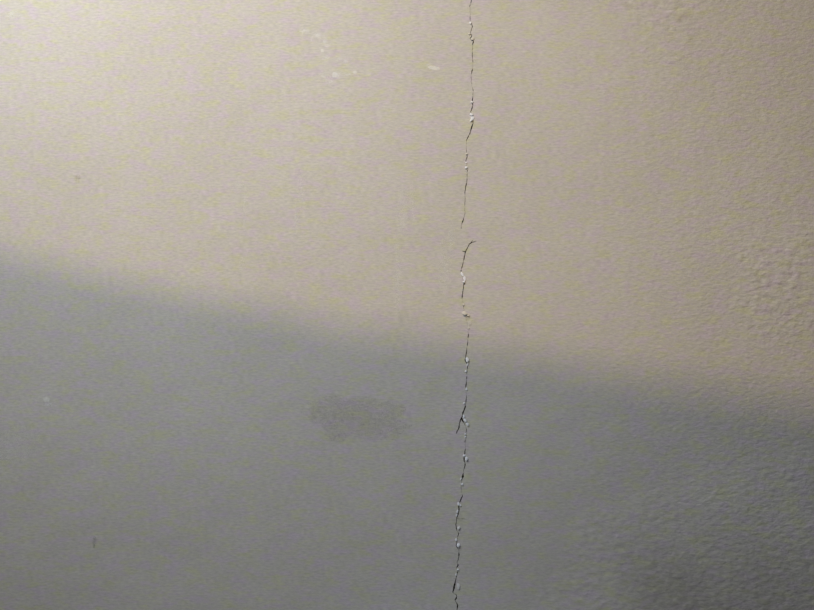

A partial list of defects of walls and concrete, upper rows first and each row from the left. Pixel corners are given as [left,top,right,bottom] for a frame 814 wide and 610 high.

crack [465,98,474,190]
crack [453,218,473,608]